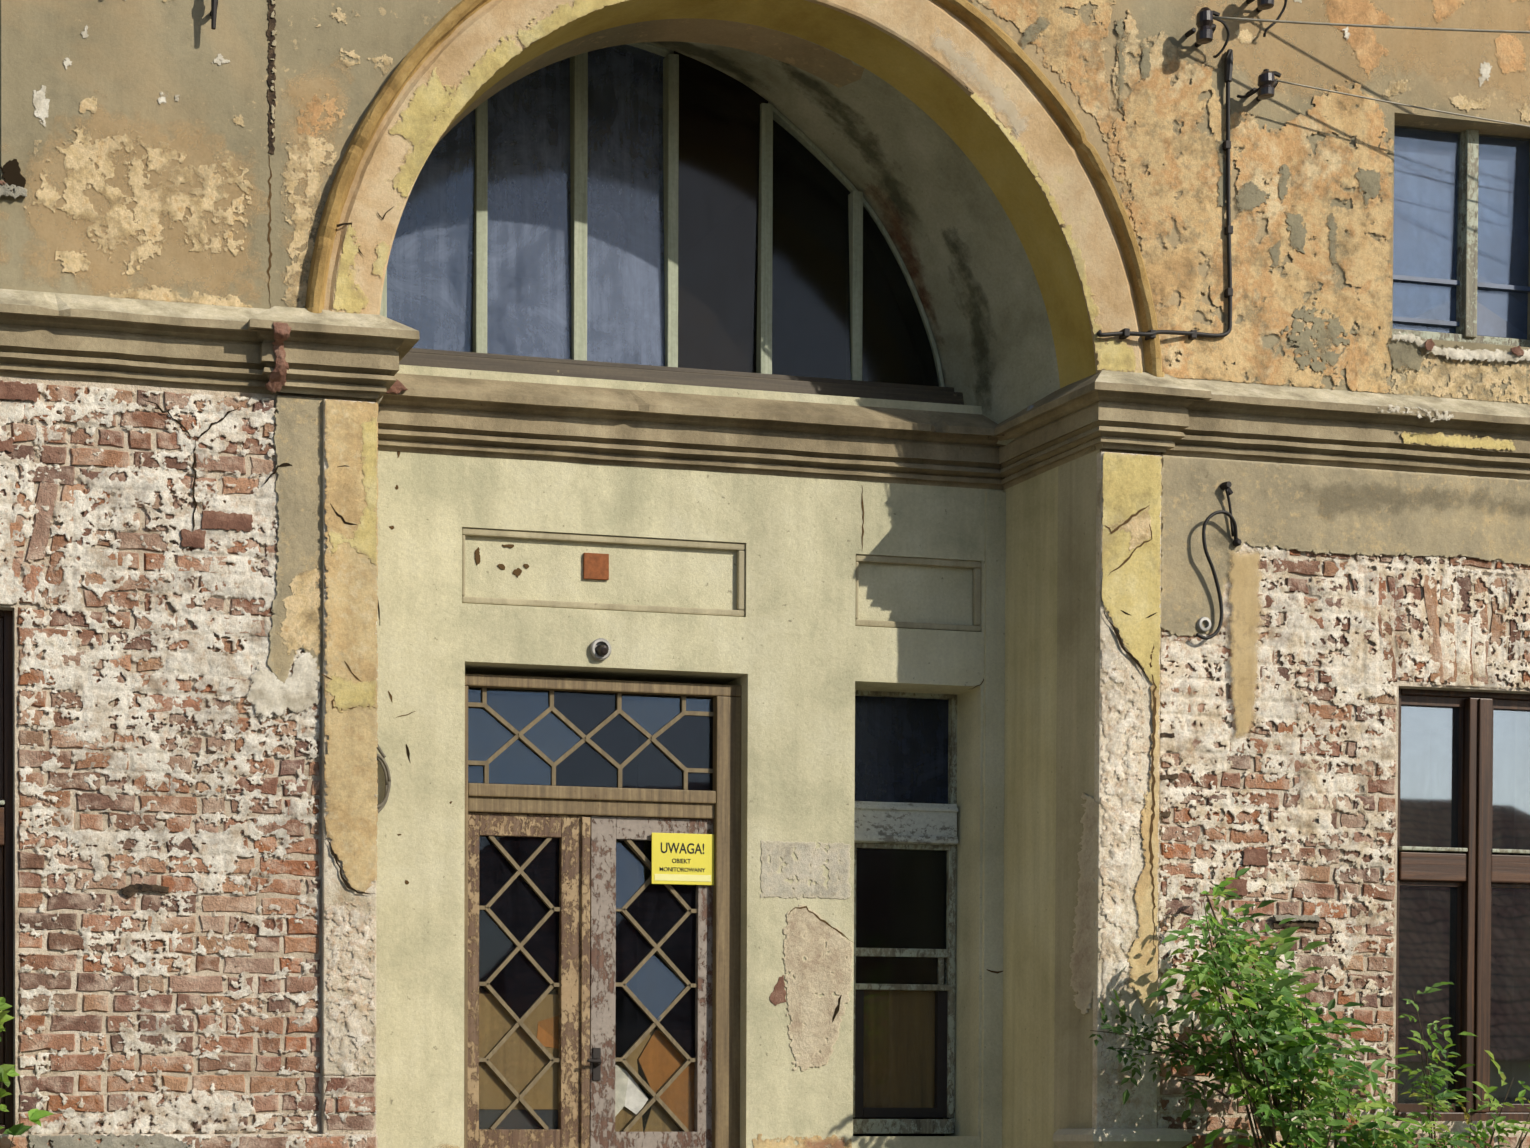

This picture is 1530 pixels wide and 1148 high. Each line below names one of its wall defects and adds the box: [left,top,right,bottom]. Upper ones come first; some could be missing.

peeling [0,85,262,308]
peeling [270,0,345,308]
peeling [971,0,1530,413]
crack [143,399,240,531]
crack [264,463,292,484]
crack [330,503,356,525]
crack [1106,506,1152,573]
peeling [0,380,378,1148]
crack [1104,610,1157,951]
peeling [1100,543,1530,1130]
flaking render [769,904,853,1071]